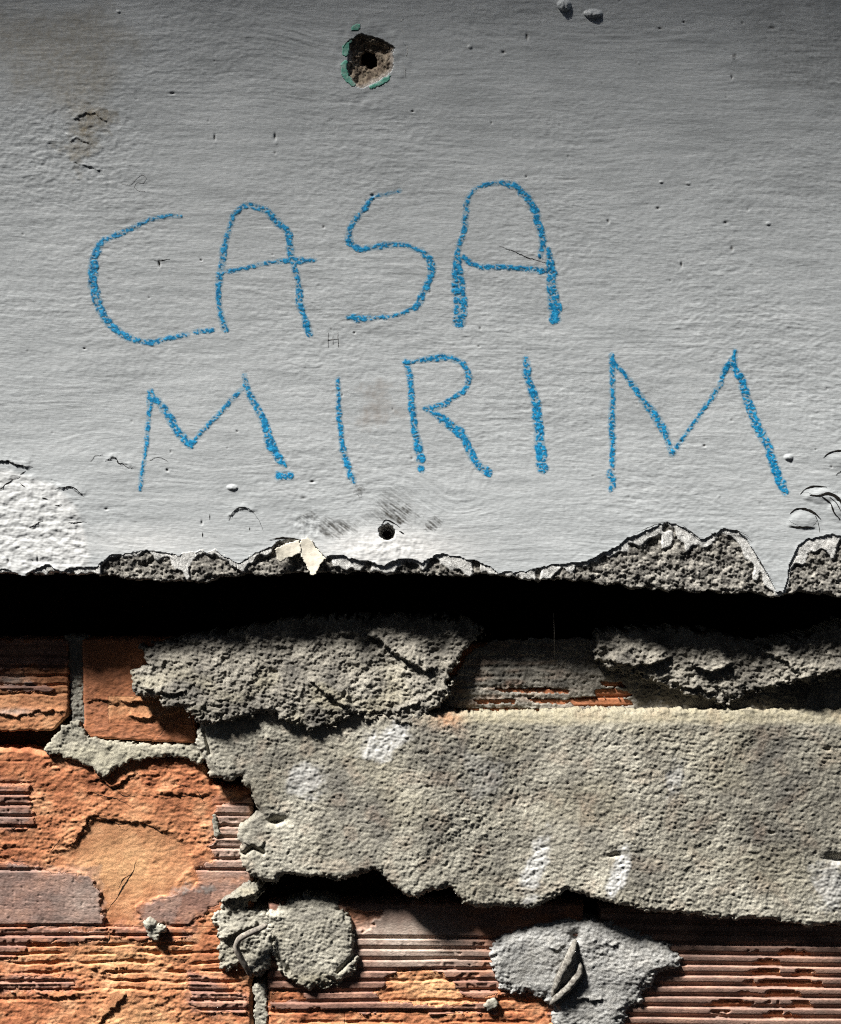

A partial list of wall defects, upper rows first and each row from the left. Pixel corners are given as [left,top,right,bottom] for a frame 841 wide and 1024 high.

hole [340,23,395,89]
crack [1,461,84,527]
spalling [0,523,841,598]
crack [51,763,167,851]
spalling [0,664,553,1024]
spalling [752,949,826,1018]